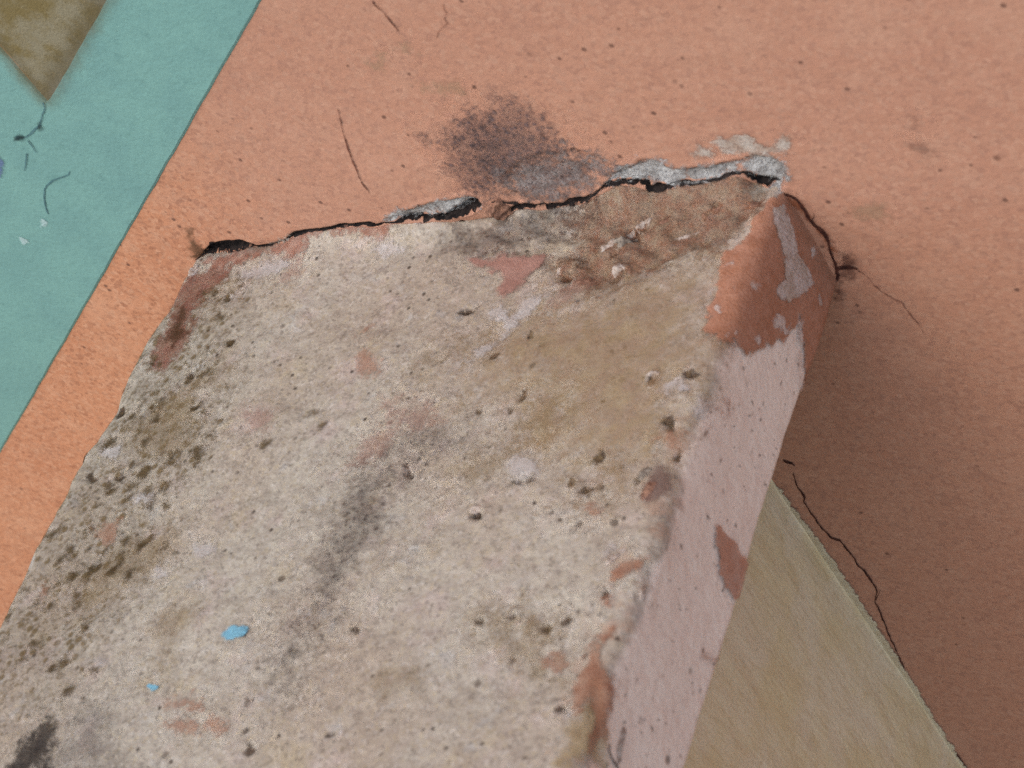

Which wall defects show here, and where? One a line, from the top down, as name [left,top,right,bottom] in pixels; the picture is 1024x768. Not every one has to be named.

spalling [383,195,482,224]
water stain [430,96,565,193]
crack [196,171,924,334]
peeling [494,142,837,388]
peeling [716,525,749,600]
crack [783,460,904,668]